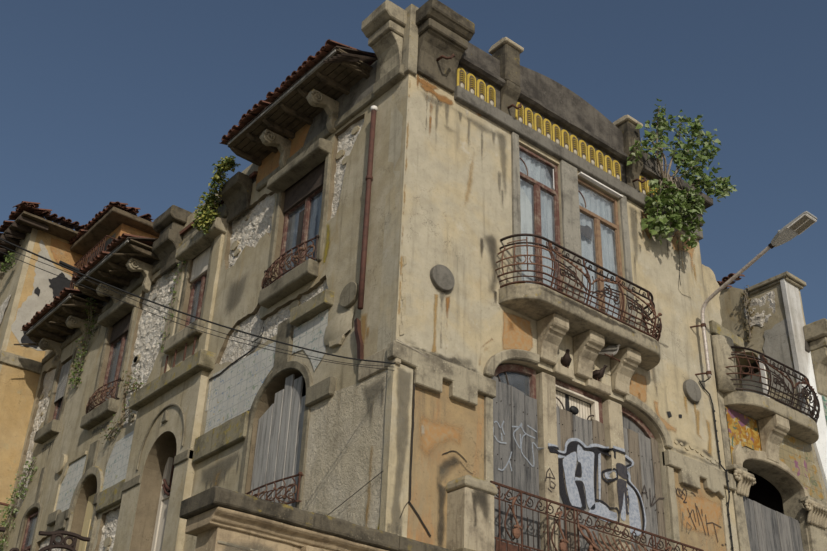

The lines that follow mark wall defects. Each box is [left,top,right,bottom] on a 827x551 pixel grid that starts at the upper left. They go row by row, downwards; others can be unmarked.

rust [417,75,453,105]
spalling [331,118,364,218]
leakage [480,126,505,197]
spalling [228,193,275,268]
flaking render [11,239,74,351]
spalling [123,265,178,428]
rust [432,293,450,352]
flaking render [721,291,795,397]
spalling [39,536,61,551]
peeling [678,494,722,536]